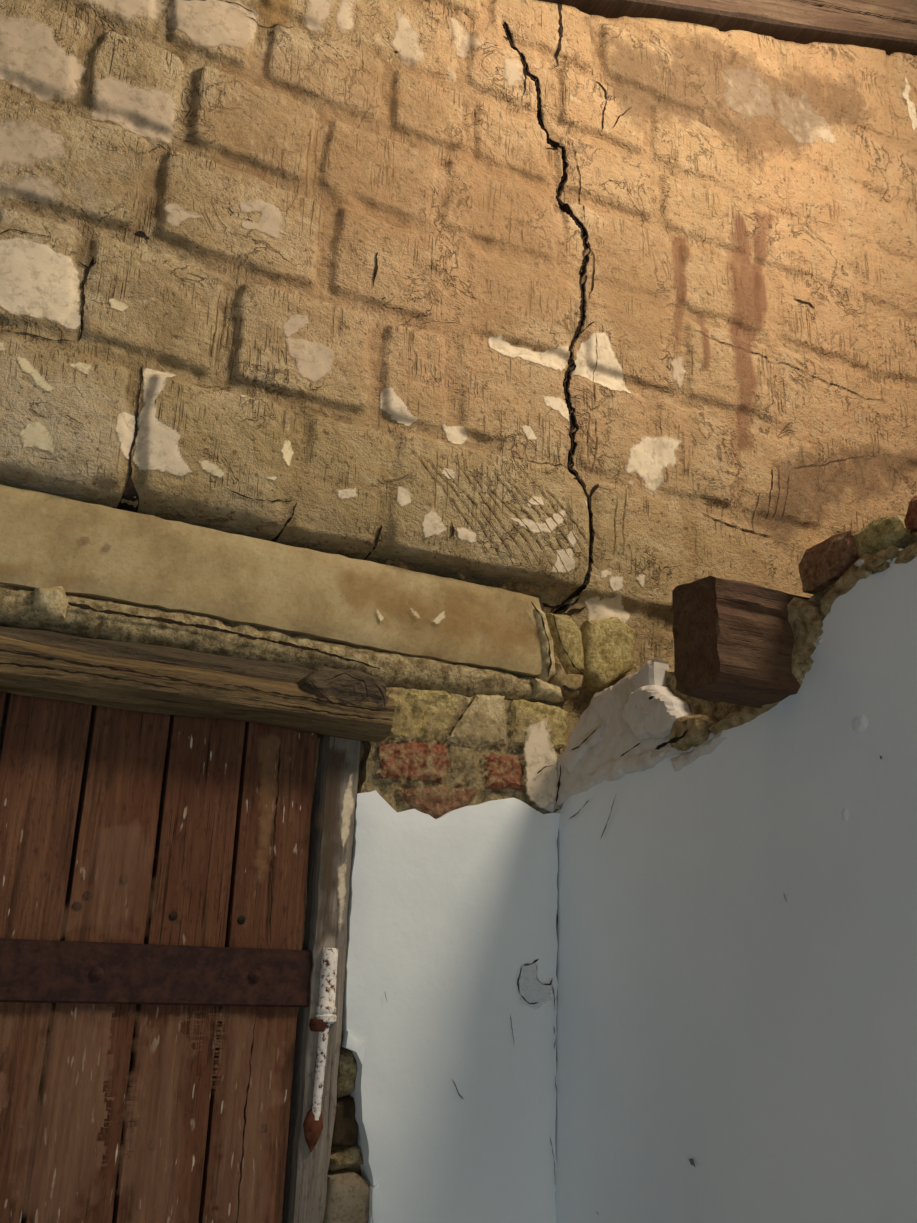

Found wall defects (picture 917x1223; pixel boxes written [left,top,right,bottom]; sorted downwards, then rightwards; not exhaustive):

peeling [0,17,85,101]
peeling [92,76,175,143]
crack [592,79,632,130]
peeling [0,238,81,329]
crack [502,3,599,616]
peeling [488,332,631,393]
crack [129,365,143,476]
peeling [115,368,225,513]
peeling [627,436,681,493]
peeling [511,496,579,573]
spalling [798,496,917,595]
flaking render [341,570,727,846]